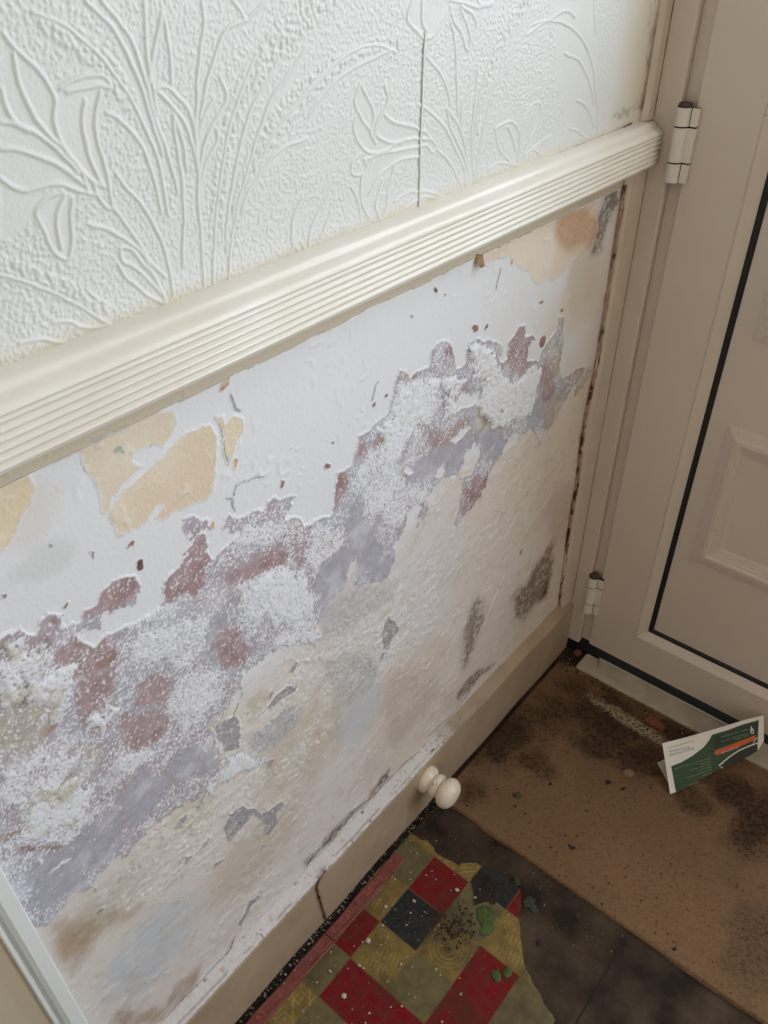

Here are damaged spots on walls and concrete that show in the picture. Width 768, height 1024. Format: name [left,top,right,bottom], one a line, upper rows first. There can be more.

peeling [0,307,593,929]
damp [465,603,481,663]
damp [516,548,552,615]
damp [458,668,489,698]
damp [204,708,298,797]
damp [160,722,456,1024]